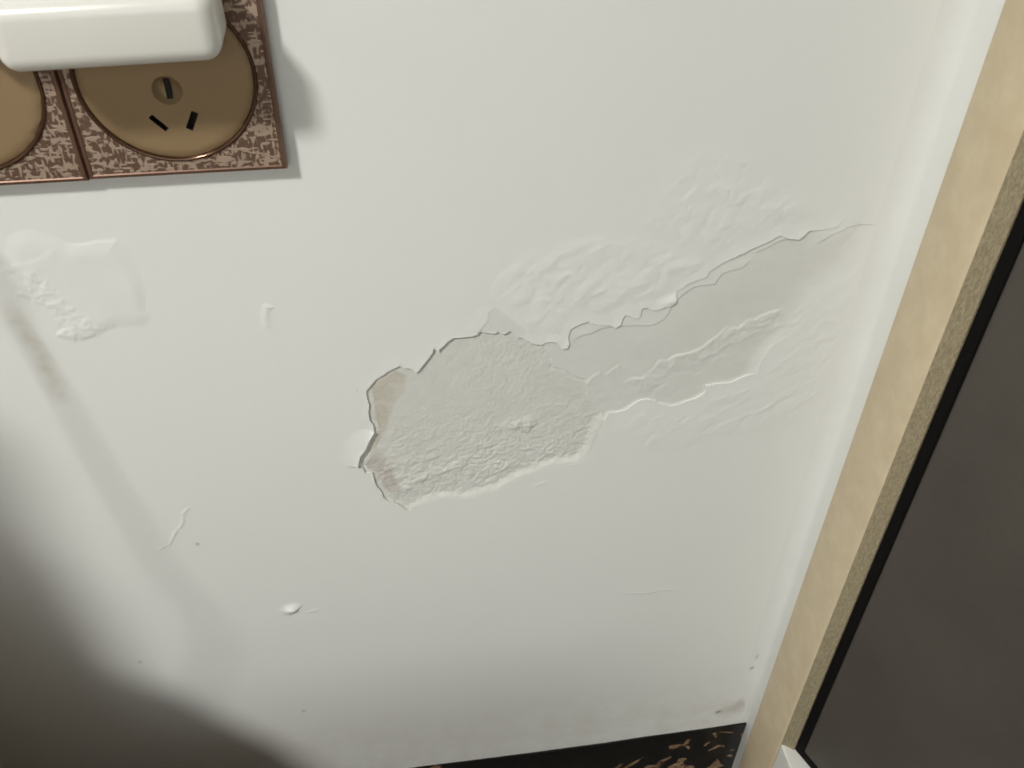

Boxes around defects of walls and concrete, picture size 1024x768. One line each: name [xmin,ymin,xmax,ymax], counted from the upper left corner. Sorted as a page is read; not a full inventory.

flaking render [341,195,879,513]